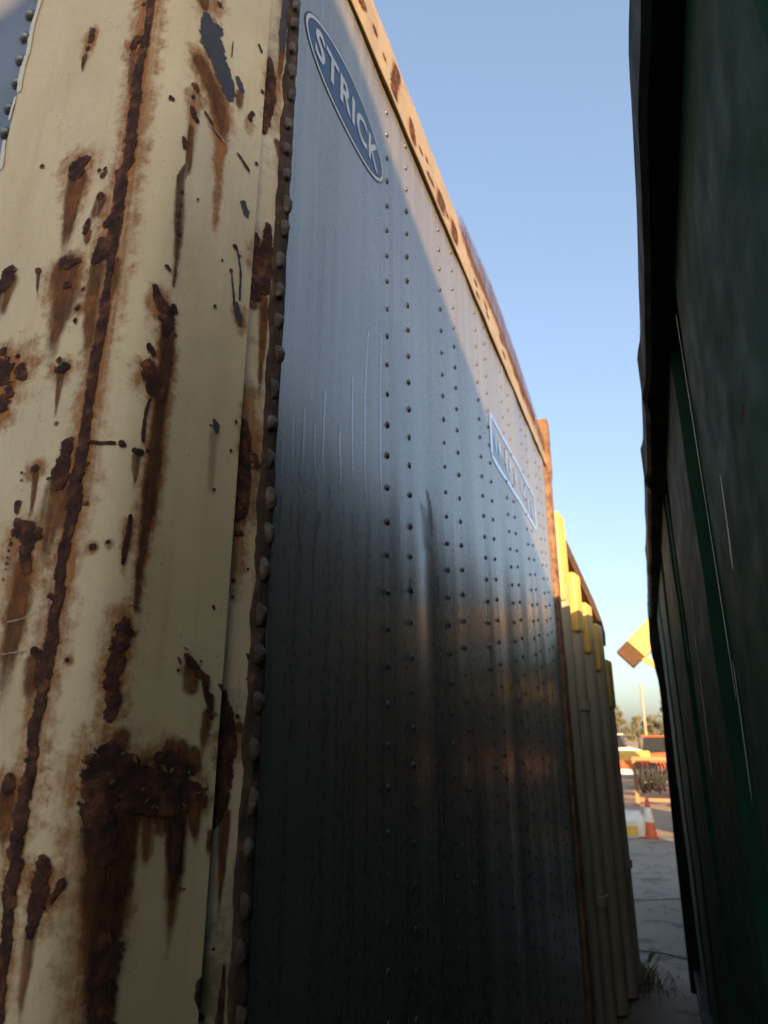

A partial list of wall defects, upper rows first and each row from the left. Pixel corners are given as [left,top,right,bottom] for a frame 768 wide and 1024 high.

peeling [182,0,256,227]
corrosion [261,0,290,157]
corrosion [383,53,401,102]
corrosion [19,125,243,1024]
corrosion [229,222,274,599]
corrosion [409,117,545,450]